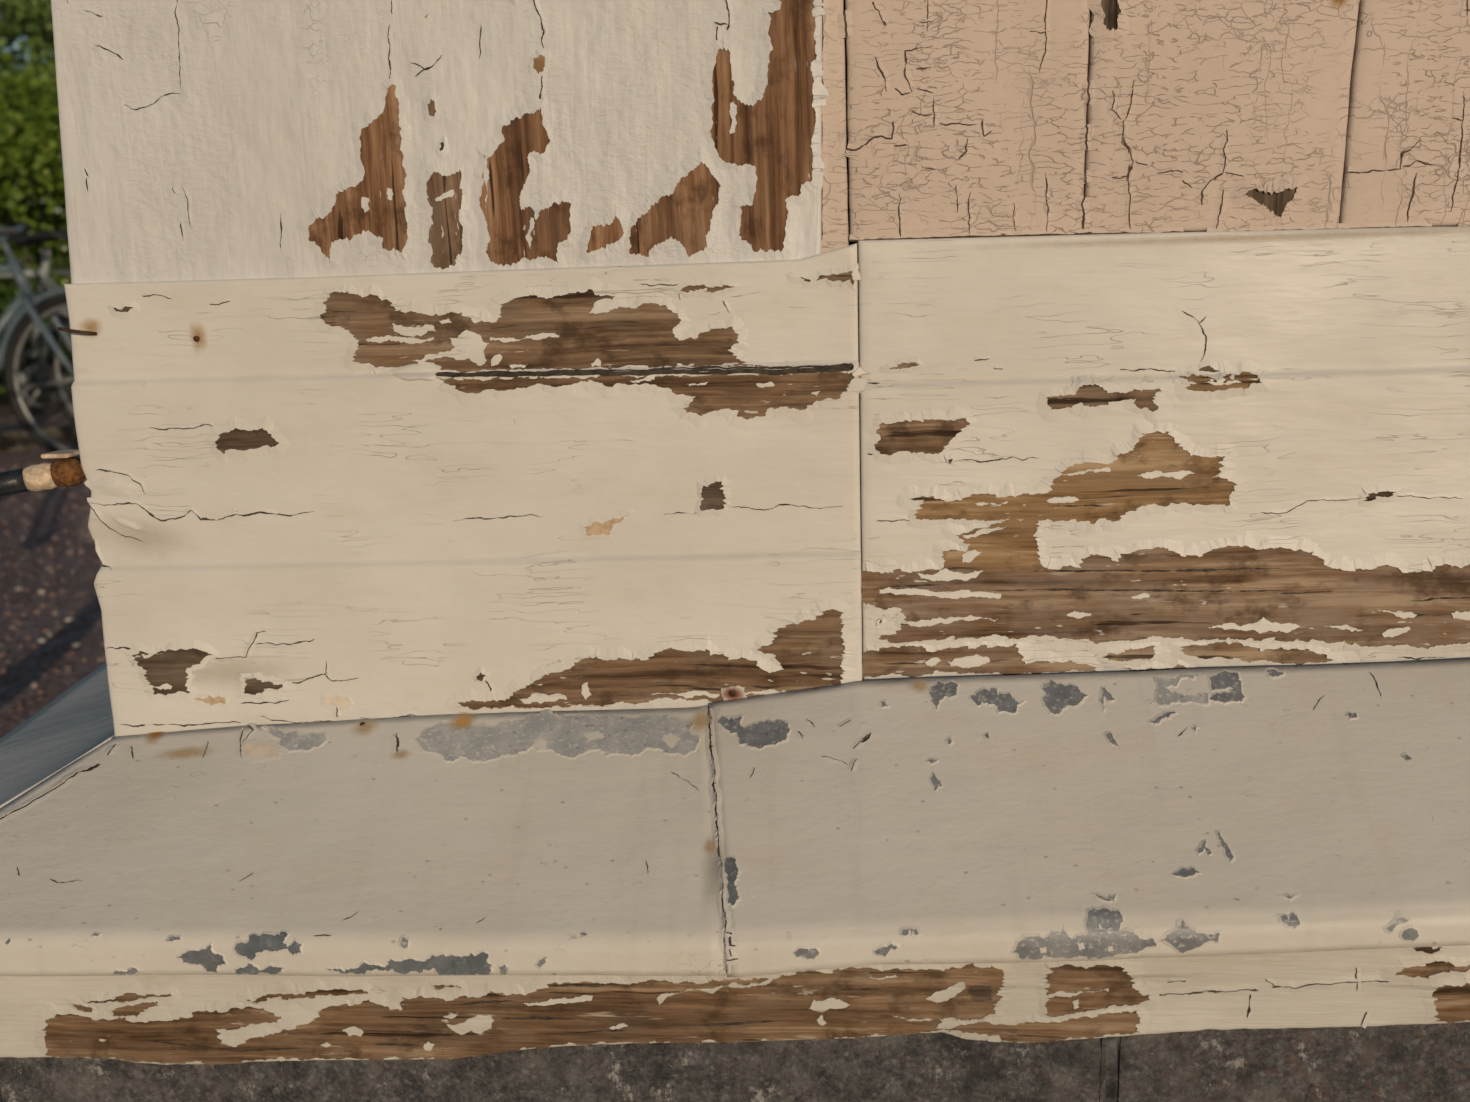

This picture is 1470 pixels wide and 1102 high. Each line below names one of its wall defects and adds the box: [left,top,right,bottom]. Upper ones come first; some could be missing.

crack [67,0,126,61]
crack [127,0,181,110]
crack [388,0,442,79]
crack [533,0,548,99]
crack [821,0,1470,242]
peeling [297,0,925,431]
peeling [205,414,290,464]
crack [87,466,314,569]
peeling [414,358,1470,764]
peeling [123,639,295,709]
peeling [33,893,1223,1065]
peeling [1379,910,1470,1024]